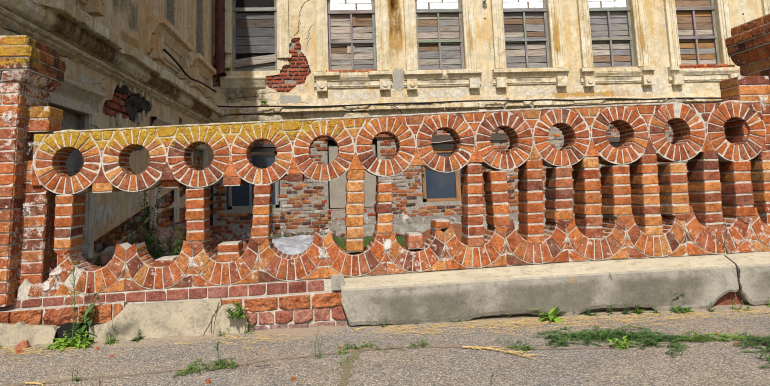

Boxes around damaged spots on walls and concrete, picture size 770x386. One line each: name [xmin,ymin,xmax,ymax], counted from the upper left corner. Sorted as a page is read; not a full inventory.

flaking render [102,81,154,125]
flaking render [266,34,314,104]
crack [709,223,742,292]